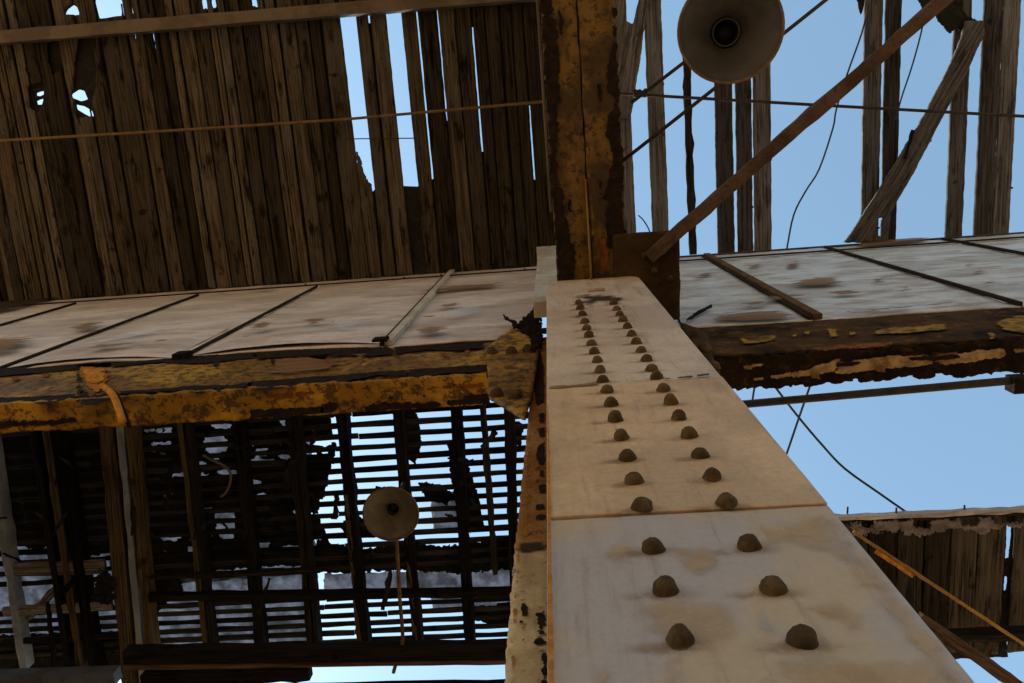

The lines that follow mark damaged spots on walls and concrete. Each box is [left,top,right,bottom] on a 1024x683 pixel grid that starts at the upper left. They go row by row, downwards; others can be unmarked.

corrosion [579,295,624,307]
corrosion [813,341,897,367]
peeling [731,315,1024,381]
corrosion [513,306,598,683]